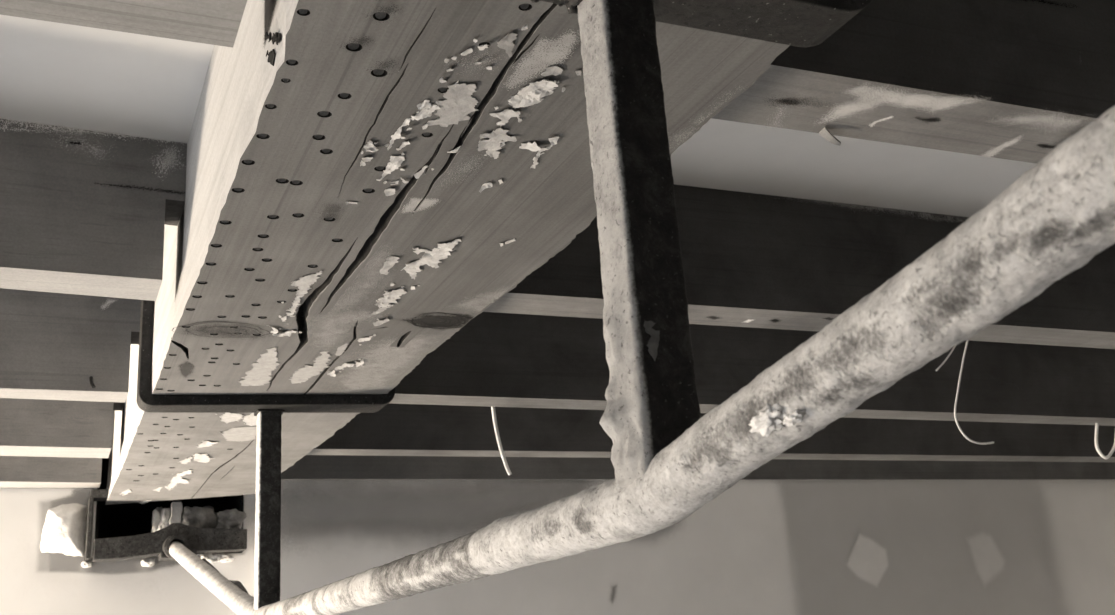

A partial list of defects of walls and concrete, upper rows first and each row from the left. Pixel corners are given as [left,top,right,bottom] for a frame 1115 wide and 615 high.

peeling [360,24,581,196]
crack [267,3,558,395]
peeling [238,271,323,386]
peeling [289,239,462,384]
spalling [94,413,257,540]
crack [191,439,255,499]